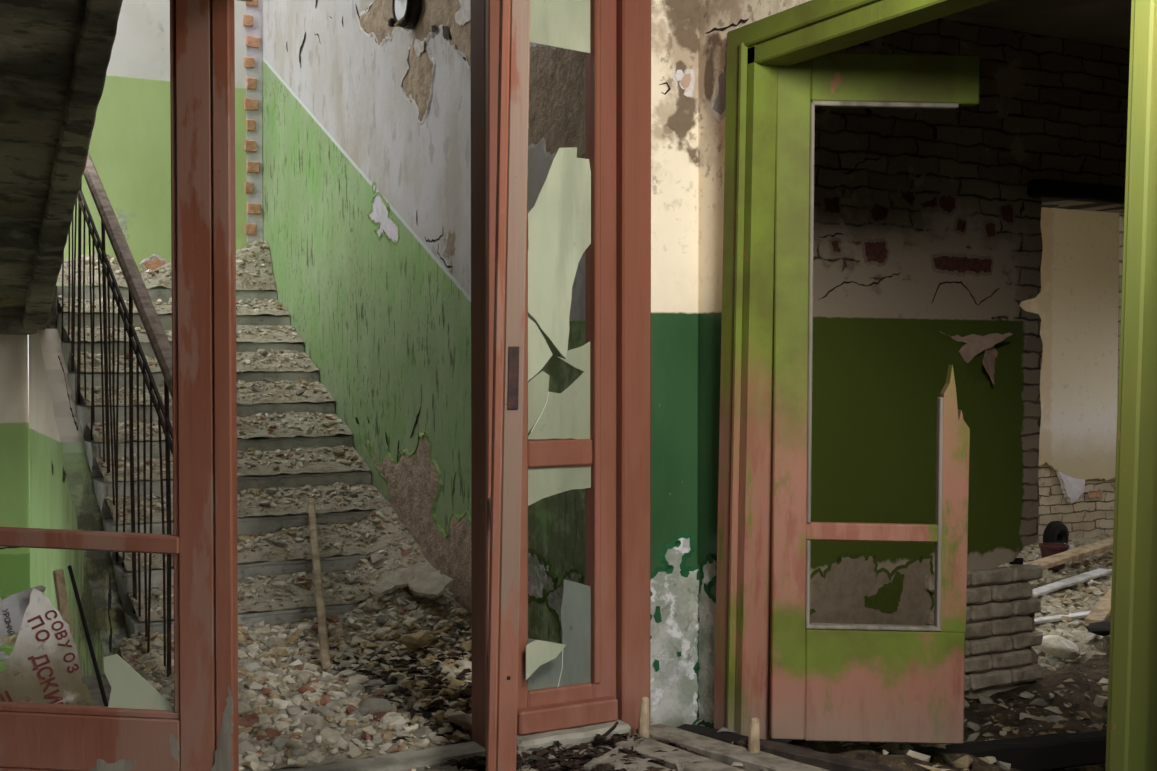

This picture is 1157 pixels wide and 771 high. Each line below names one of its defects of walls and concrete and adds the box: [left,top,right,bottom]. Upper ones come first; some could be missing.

spalling [358,0,471,125]
spalling [528,43,585,160]
leakage [666,0,720,163]
crack [818,272,901,300]
crack [931,281,1000,306]
peeling [364,431,472,617]
flaking render [1056,471,1085,504]
peeling [650,533,717,729]